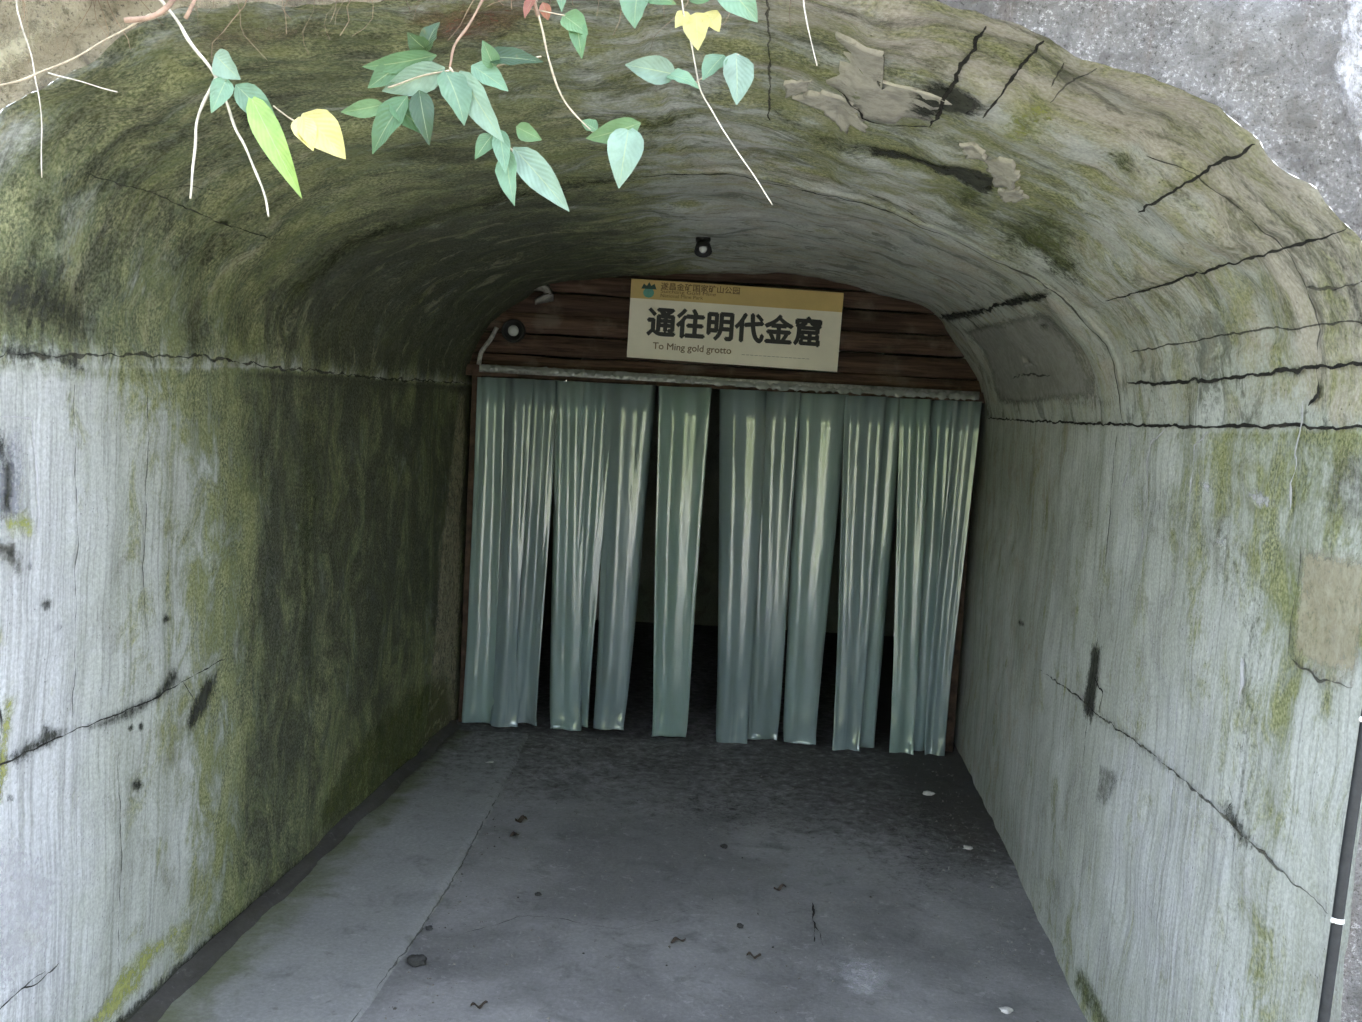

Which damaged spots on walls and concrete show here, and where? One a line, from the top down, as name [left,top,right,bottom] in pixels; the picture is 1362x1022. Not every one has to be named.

peeling [783,31,984,134]
peeling [872,142,1030,203]
crack [1147,156,1362,406]
crack [939,293,1047,331]
crack [0,659,225,765]
leakage [90,671,177,731]
leakage [189,674,217,729]
crack [1041,437,1328,914]
leakage [14,727,61,760]
crack [0,962,60,1009]